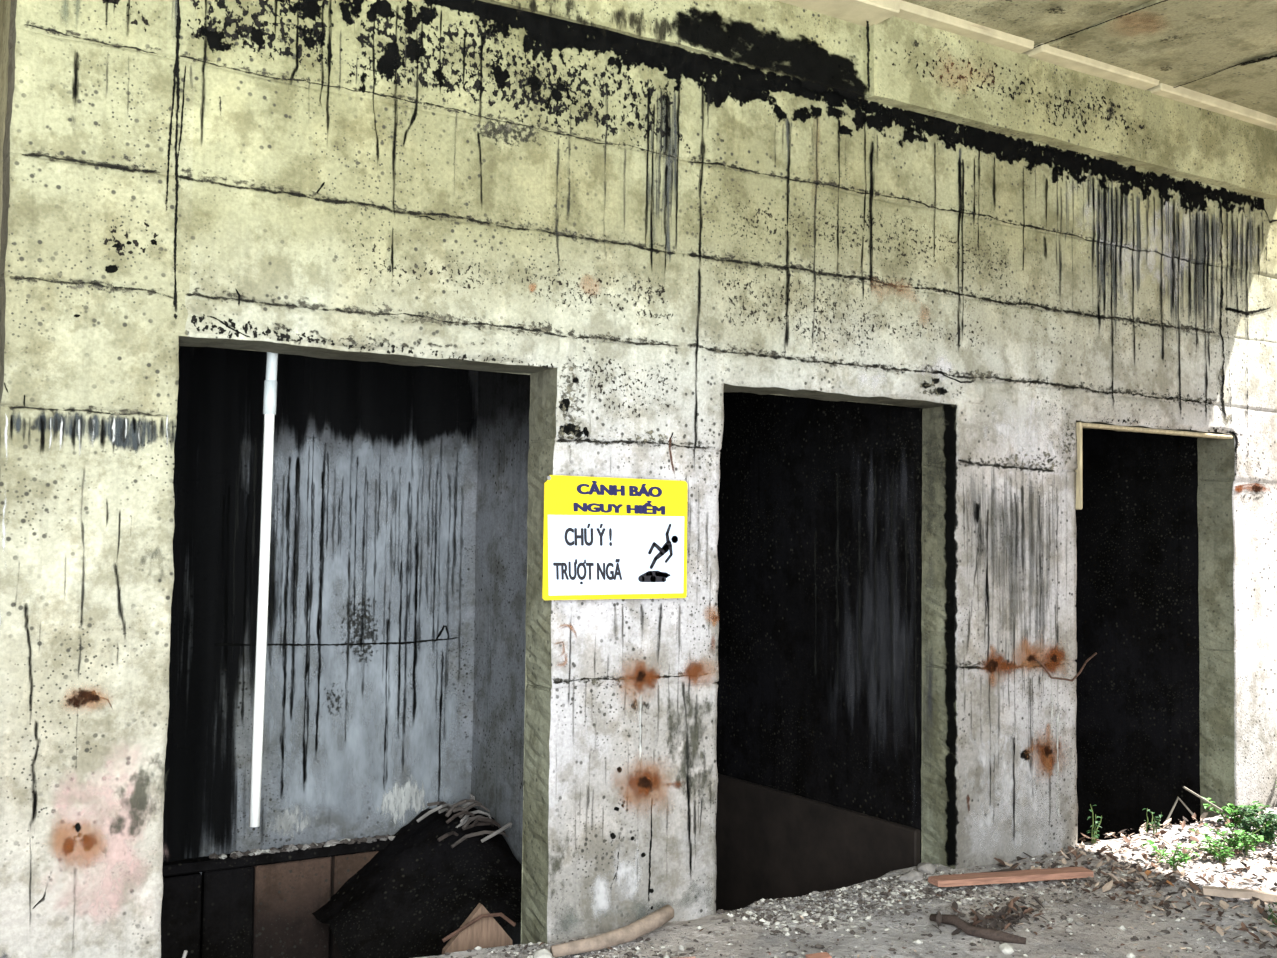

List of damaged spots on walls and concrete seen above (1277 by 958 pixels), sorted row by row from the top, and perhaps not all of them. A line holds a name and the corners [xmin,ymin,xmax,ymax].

damp [185,0,1267,414]
crack [4,0,1277,480]
damp [10,346,477,914]
rust [629,668,658,689]
rust [686,664,705,681]
rust [985,642,1064,682]
rust [66,690,112,708]
rust [1020,731,1060,772]
rust [627,768,680,800]
rust [56,823,99,857]